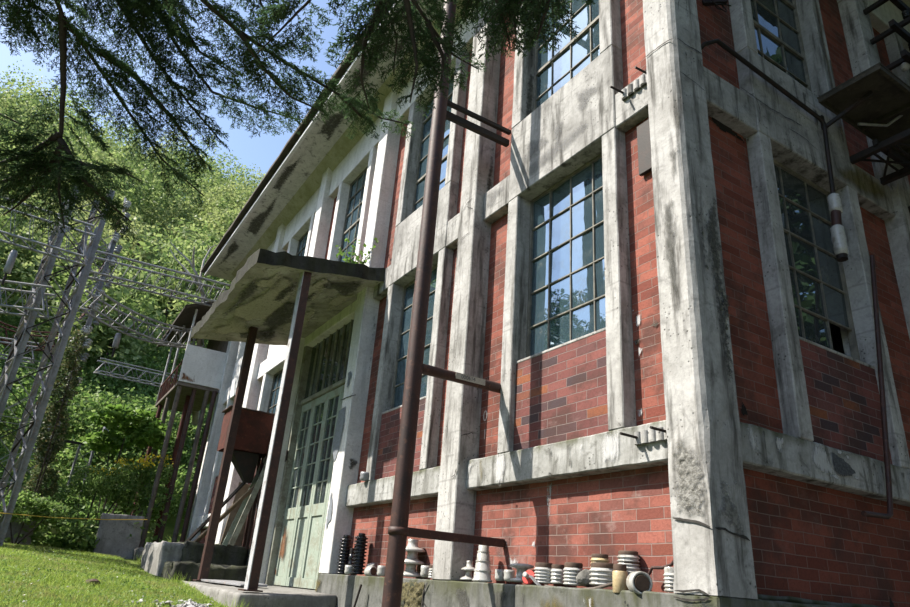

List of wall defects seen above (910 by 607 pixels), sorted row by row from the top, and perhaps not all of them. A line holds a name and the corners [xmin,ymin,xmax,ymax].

damp [665,201,676,290]
damp [239,285,296,342]
damp [307,283,360,301]
damp [699,199,732,376]
peeling [832,450,858,479]
damp [456,589,468,607]